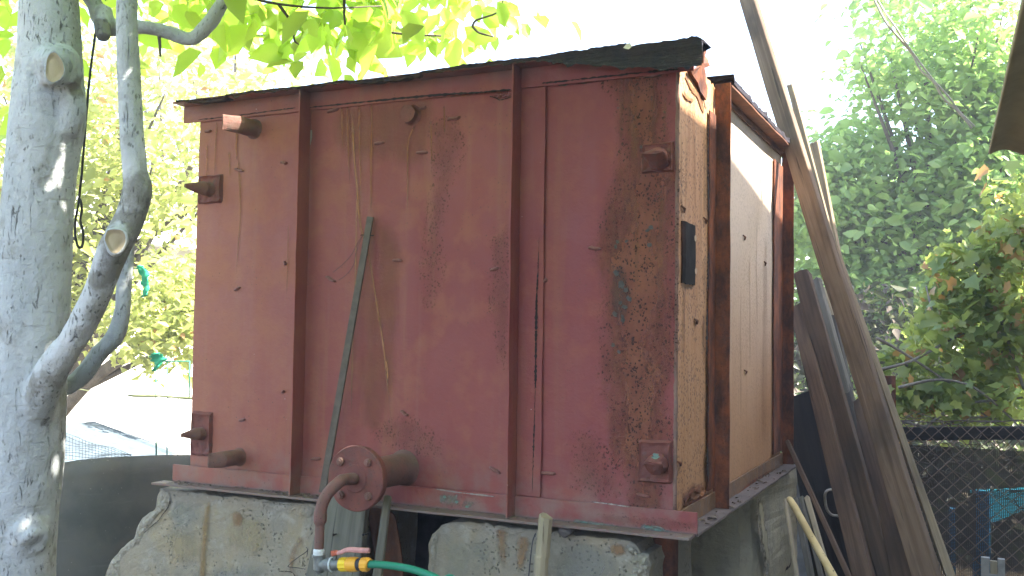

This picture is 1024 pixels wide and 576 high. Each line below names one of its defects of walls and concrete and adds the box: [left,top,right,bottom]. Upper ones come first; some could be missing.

rust [683,483,707,507]